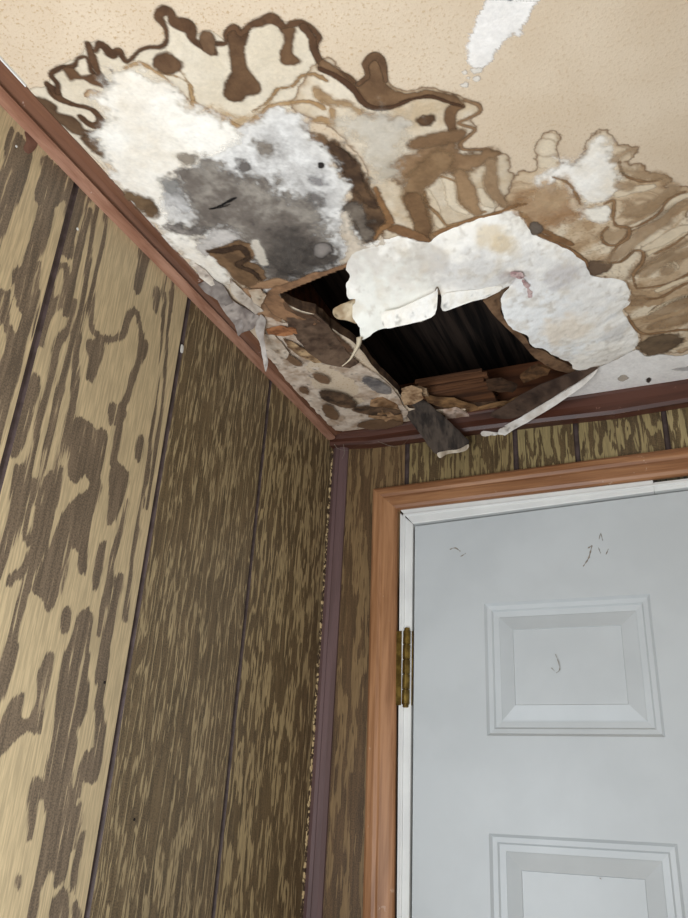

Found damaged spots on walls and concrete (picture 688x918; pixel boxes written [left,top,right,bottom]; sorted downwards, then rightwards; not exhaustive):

leakage [29,5,688,356]
peeling [90,69,688,431]
peeling [460,0,540,87]